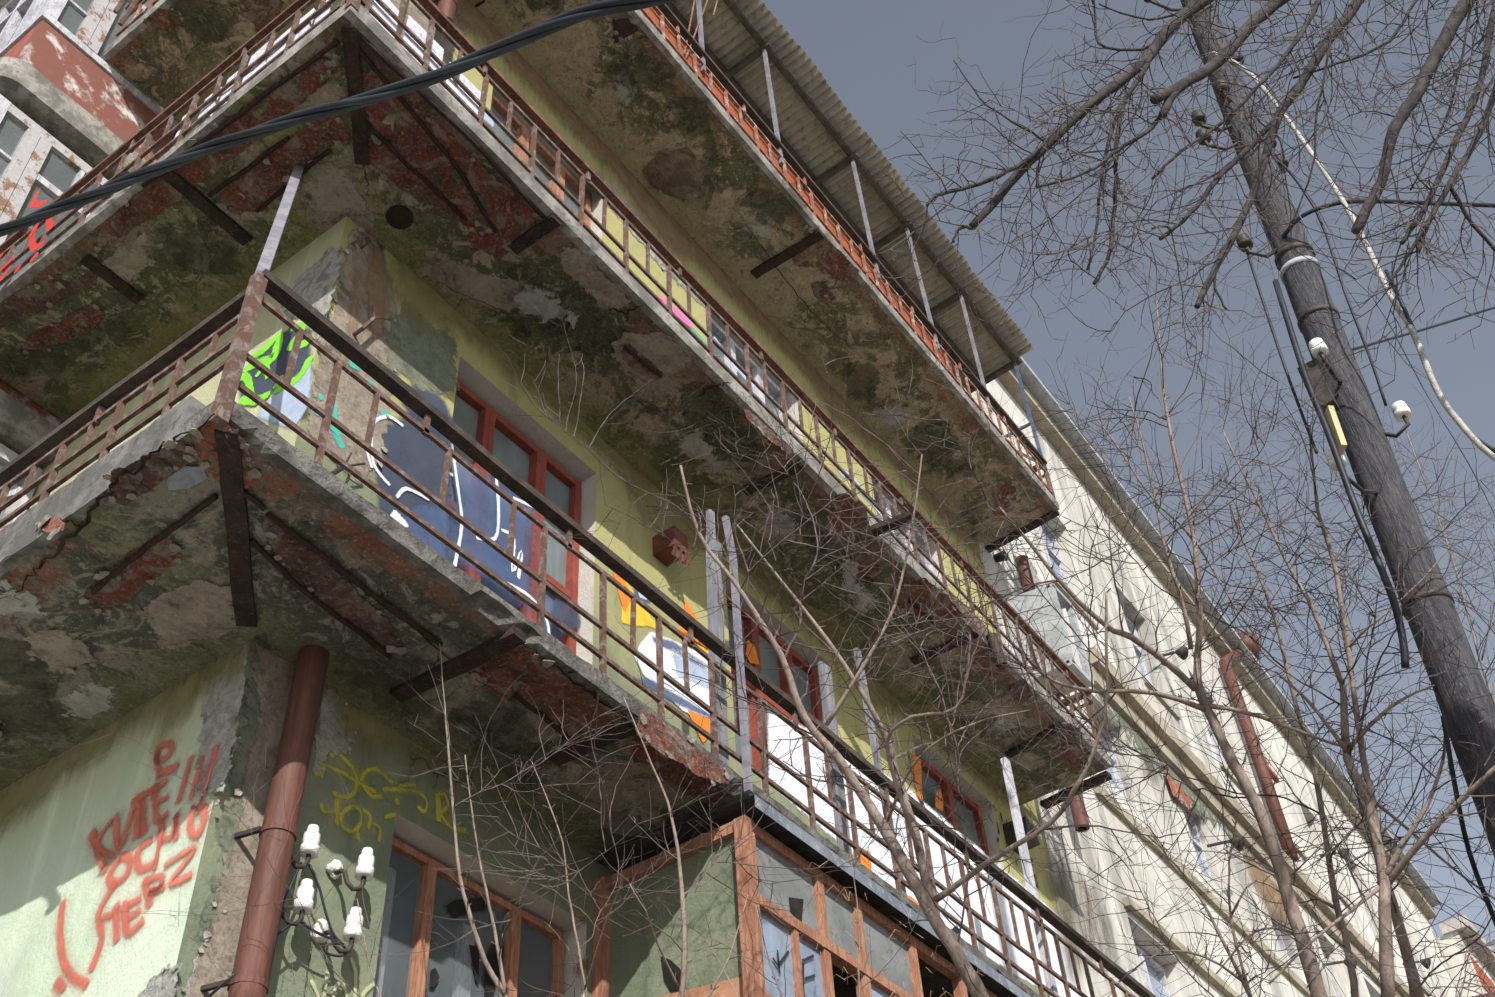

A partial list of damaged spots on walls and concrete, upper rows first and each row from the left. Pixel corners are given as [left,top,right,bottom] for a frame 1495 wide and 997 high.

spalling [143,8,185,30]
peeling [0,39,398,487]
spalling [359,0,546,312]
leakage [456,0,979,558]
peeling [19,629,98,675]
crack [0,413,215,599]
peeling [78,424,443,997]